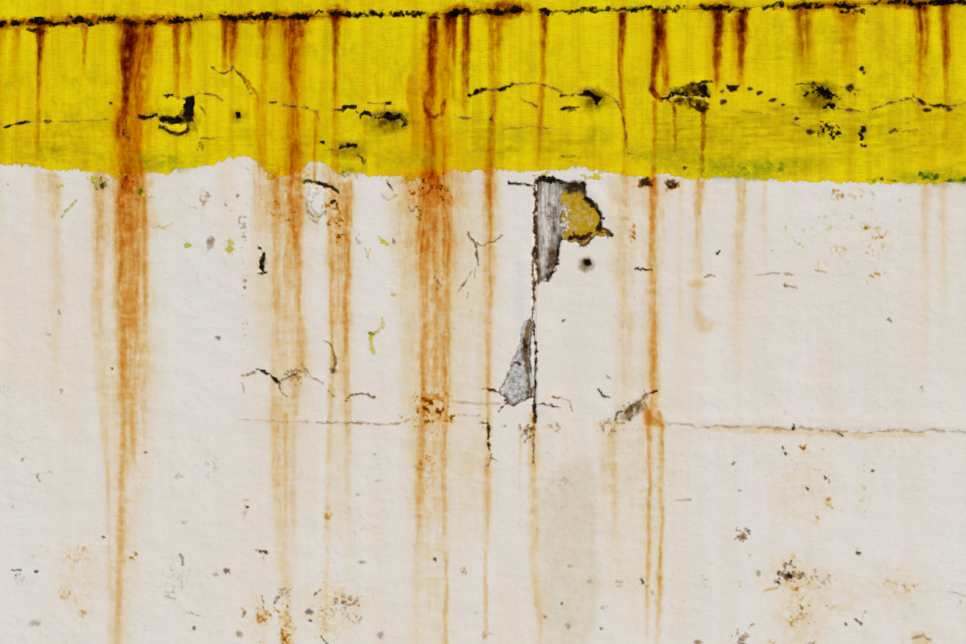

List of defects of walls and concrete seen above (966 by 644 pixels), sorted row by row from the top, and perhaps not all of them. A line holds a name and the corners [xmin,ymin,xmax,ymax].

corrosion [116,20,153,159]
corrosion [409,11,472,201]
corrosion [649,8,668,108]
corrosion [712,7,749,81]
corrosion [941,4,950,70]
corrosion [638,169,680,189]
peeling [532,175,613,283]
crack [241,341,337,388]
peeling [499,319,535,406]
crack [482,255,559,463]
crack [323,392,400,425]
corrosion [417,397,455,423]